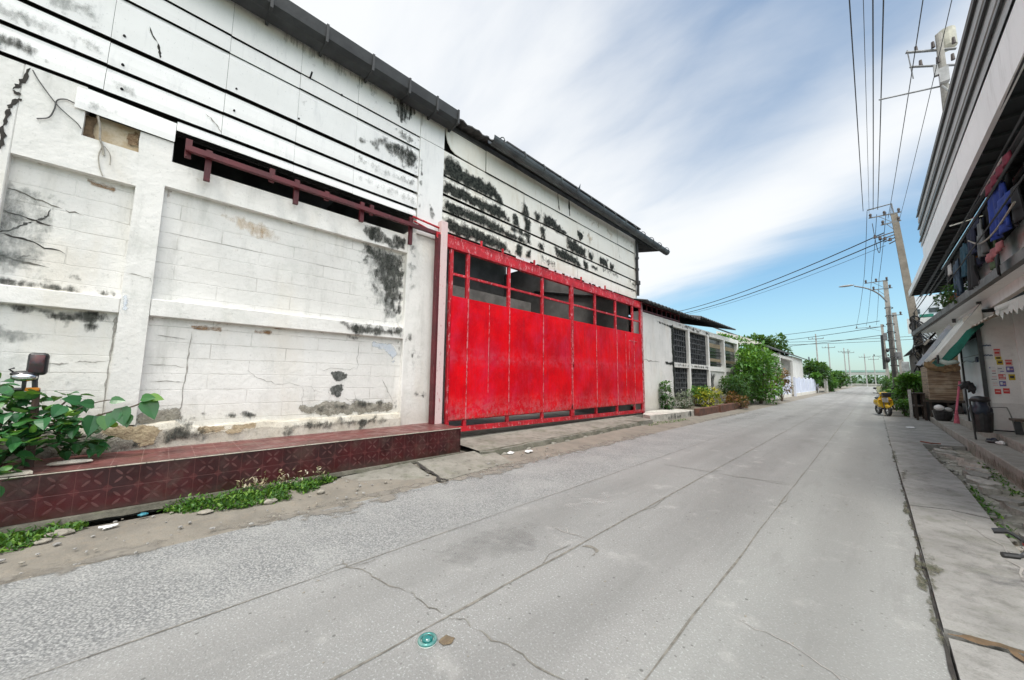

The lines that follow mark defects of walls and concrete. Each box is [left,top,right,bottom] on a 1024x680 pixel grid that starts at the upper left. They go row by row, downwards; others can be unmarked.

spalling [83,115,142,152]
crack [0,188,81,267]
leakage [363,226,406,314]
leakage [511,204,567,257]
leakage [584,252,614,270]
leakage [13,305,104,330]
crack [150,333,192,411]
crack [22,391,868,680]